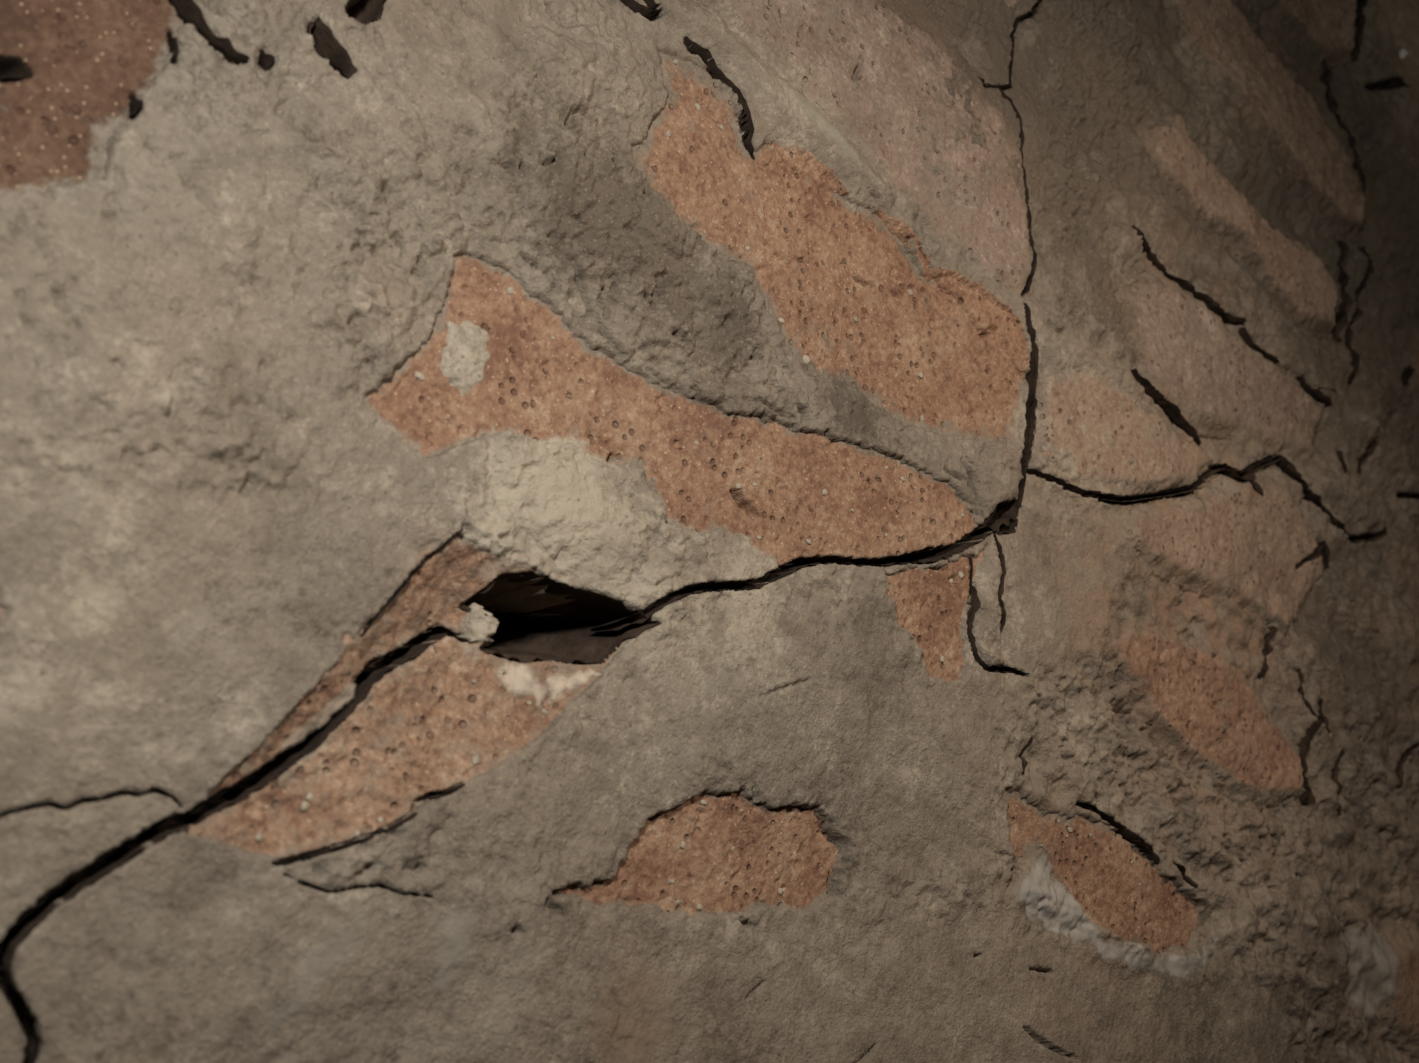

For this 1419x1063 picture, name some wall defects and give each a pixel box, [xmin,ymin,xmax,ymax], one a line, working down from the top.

spalling [0,0,184,195]
crack [128,93,144,120]
crack [166,0,275,71]
spalling [630,0,1338,639]
crack [589,0,1419,676]
spalling [365,255,986,683]
crack [0,527,478,1063]
spalling [172,536,625,860]
spalling [552,791,841,915]
spalling [1006,790,1204,954]
crack [1076,802,1198,888]
crack [1257,626,1345,815]